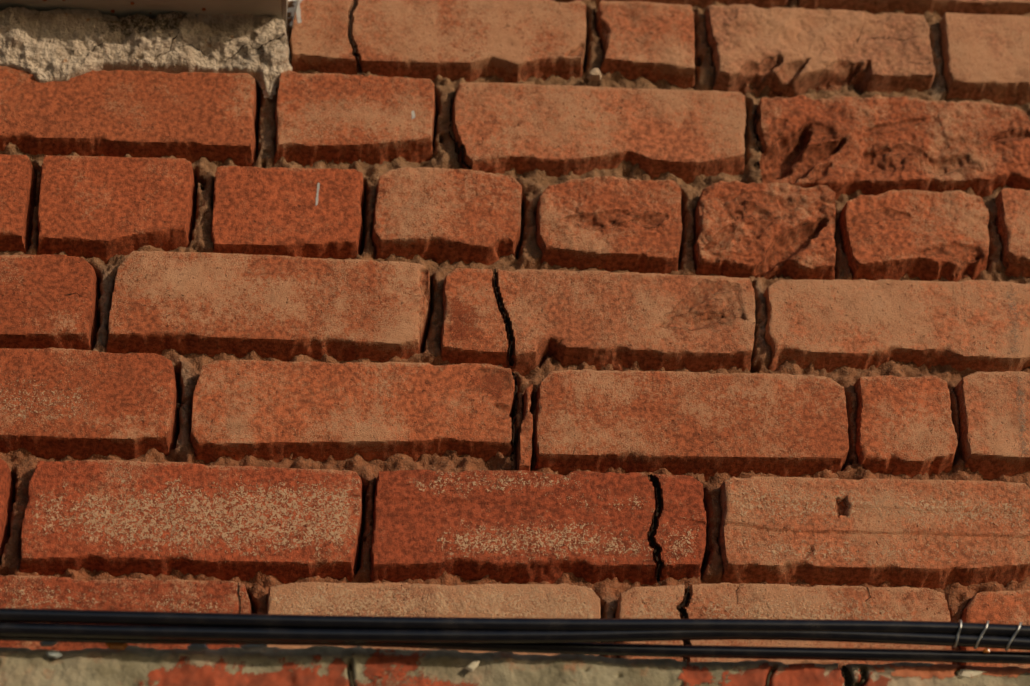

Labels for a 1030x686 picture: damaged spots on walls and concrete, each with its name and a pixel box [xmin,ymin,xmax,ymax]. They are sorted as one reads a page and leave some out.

crack [156,33,285,63]
crack [349,0,365,76]
spalling [860,118,982,176]
spalling [987,128,1030,144]
spalling [702,118,846,277]
crack [494,269,518,471]
crack [648,474,663,585]
crack [679,586,691,661]
peeling [139,644,480,686]
peeling [678,661,1030,686]
crack [842,665,867,686]